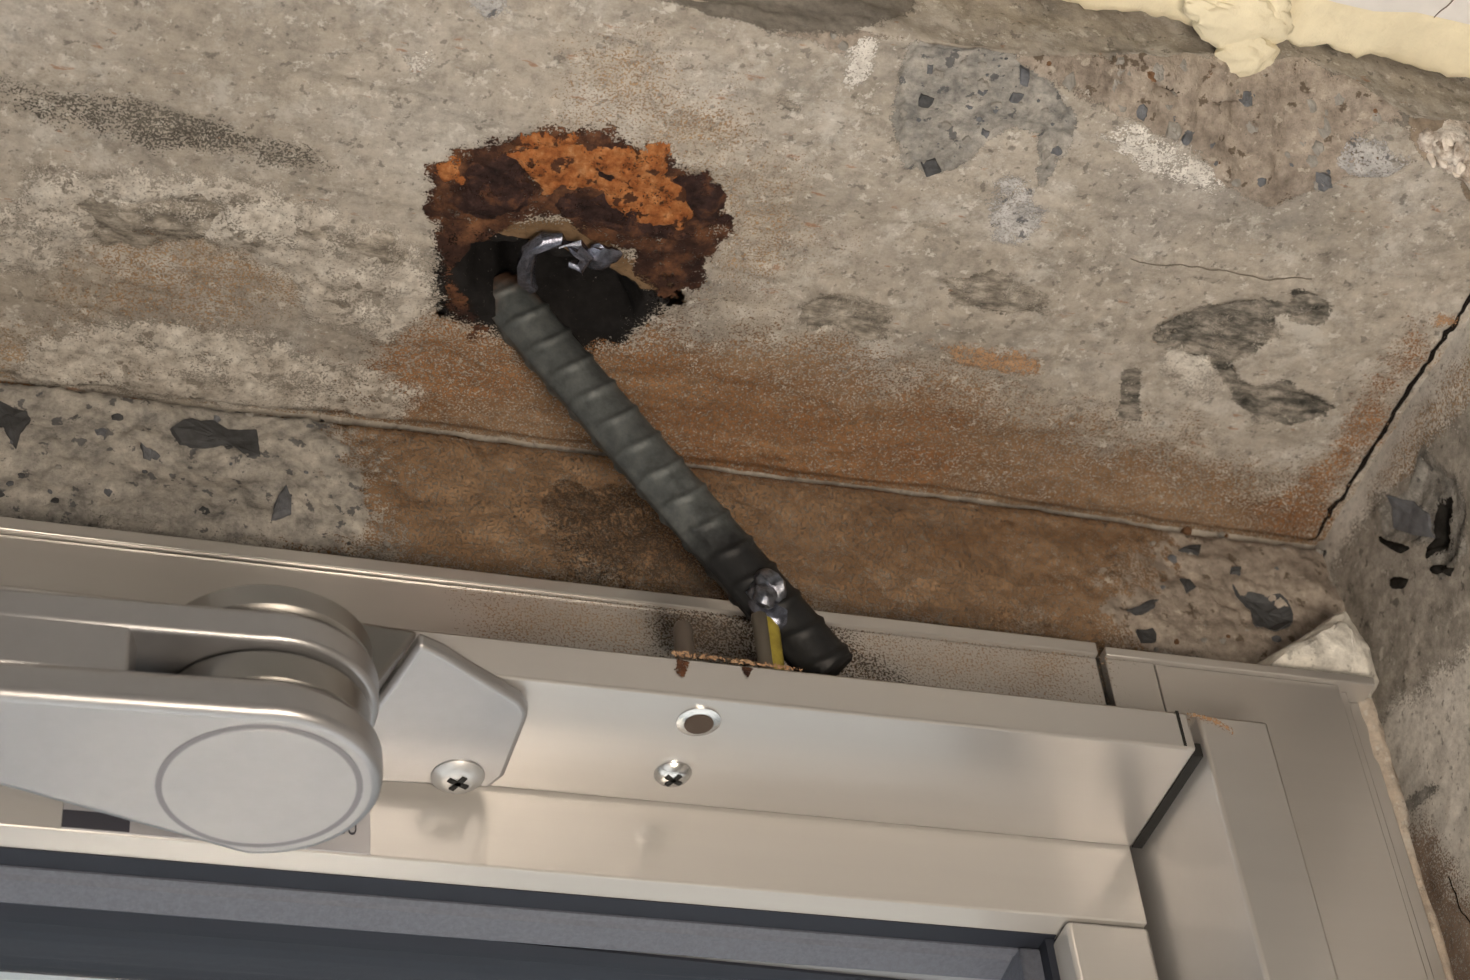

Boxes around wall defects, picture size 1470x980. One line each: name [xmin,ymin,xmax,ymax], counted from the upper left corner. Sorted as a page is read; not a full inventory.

spalling [776,29,1470,248]
corrosion [233,16,860,677]
peeling [797,293,893,342]
peeling [944,269,1054,316]
corrosion [689,311,1459,705]
spalling [1116,368,1143,422]
spalling [949,391,1470,726]
spalling [1151,287,1336,426]
crack [1307,294,1470,540]
crack [1448,877,1470,923]